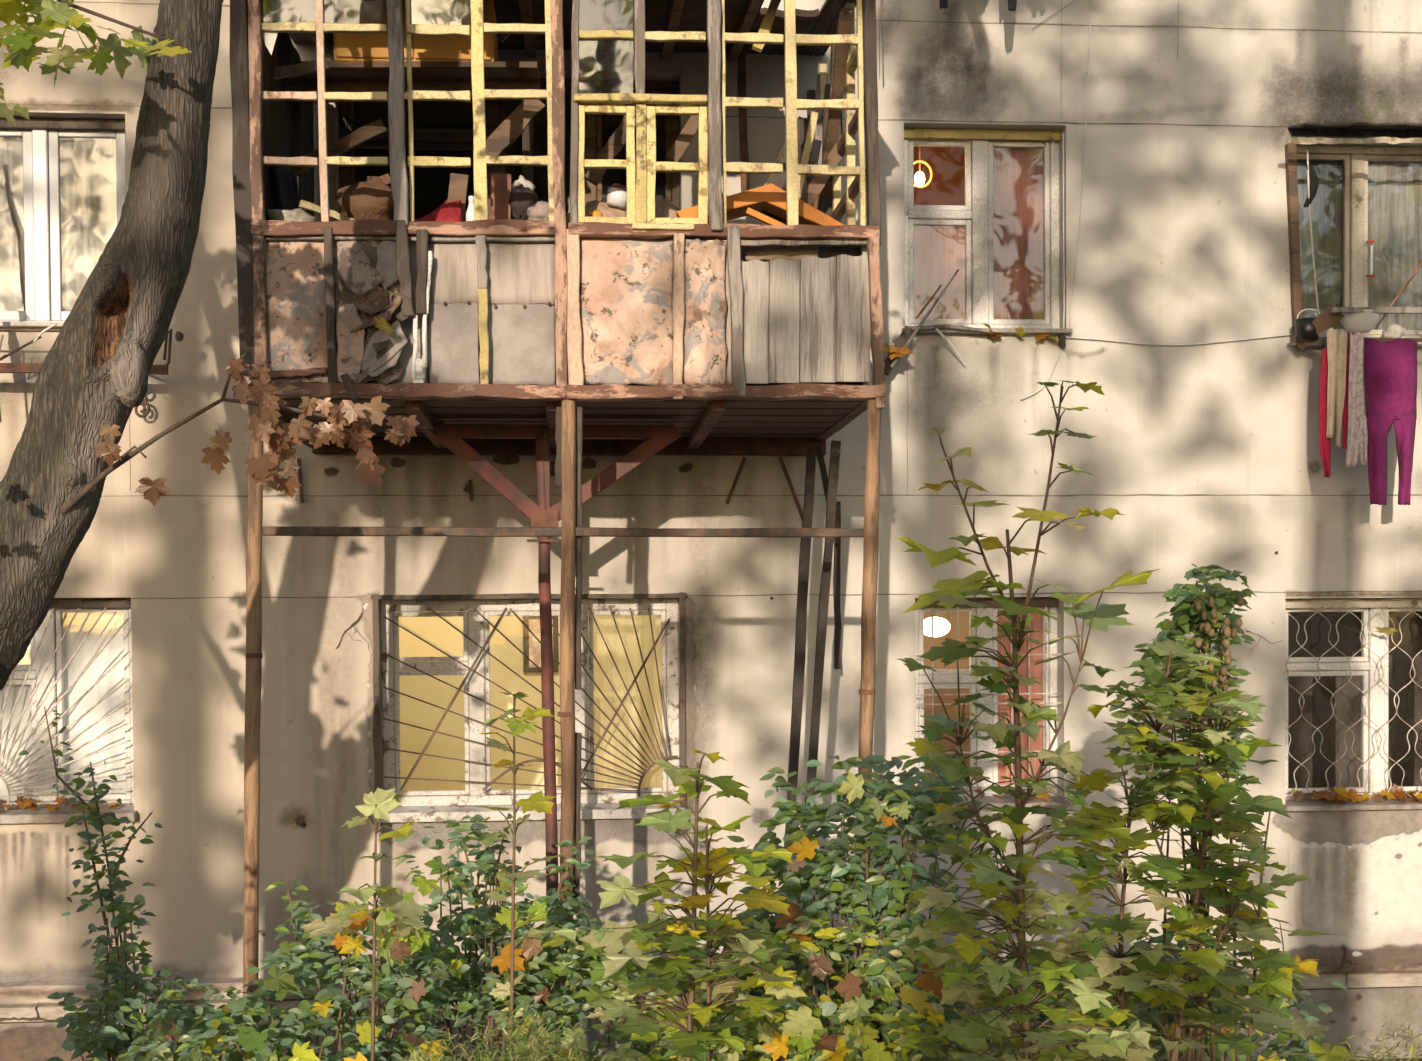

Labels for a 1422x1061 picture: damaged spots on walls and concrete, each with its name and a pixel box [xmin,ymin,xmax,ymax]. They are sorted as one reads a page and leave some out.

leakage [1288,87,1422,137]